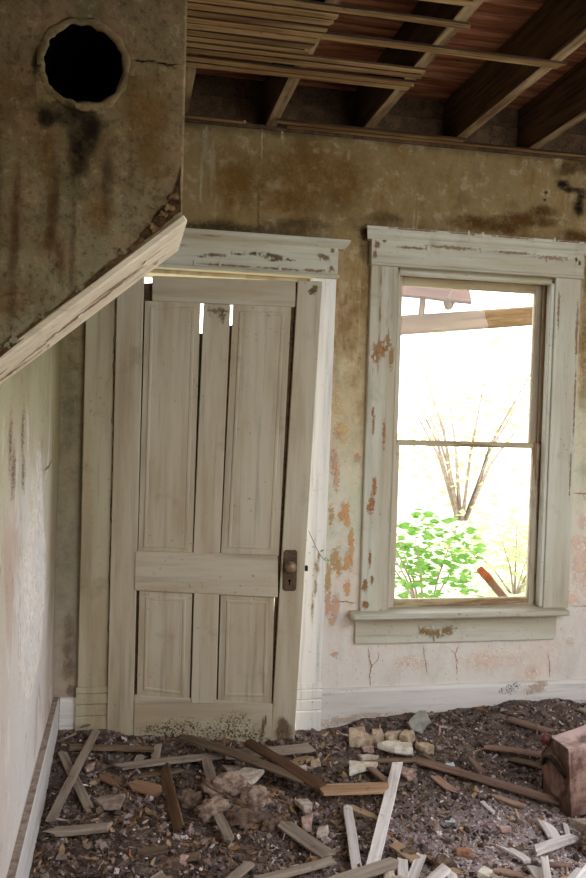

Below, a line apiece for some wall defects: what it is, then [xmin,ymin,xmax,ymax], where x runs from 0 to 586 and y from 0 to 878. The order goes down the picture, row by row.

crack [132,59,180,68]
damp [556,158,586,215]
damp [458,191,553,233]
peeling [194,249,335,272]
peeling [401,245,483,253]
damp [565,231,586,242]
peeling [370,336,394,364]
peeling [367,477,376,514]
peeling [325,503,354,625]
peeling [361,553,374,610]
peeling [420,625,457,641]
crack [368,650,379,687]